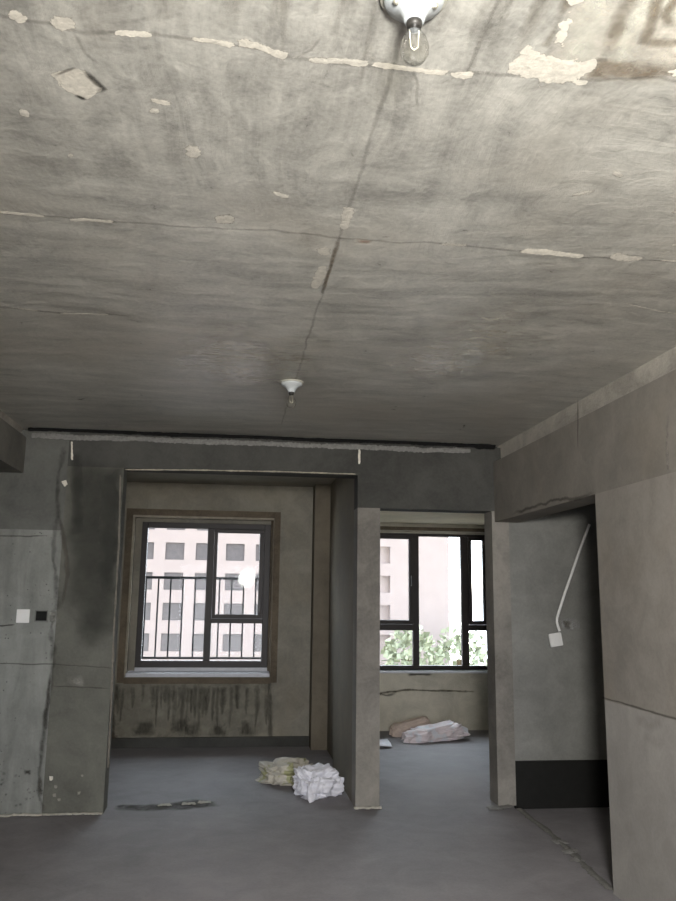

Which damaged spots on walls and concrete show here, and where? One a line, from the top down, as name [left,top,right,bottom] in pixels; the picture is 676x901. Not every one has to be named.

crack [8,10,28,23]
crack [50,15,76,32]
crack [115,29,152,37]
peeling [554,0,584,47]
peeling [643,0,676,43]
crack [192,37,474,79]
peeling [507,45,676,87]
spalling [51,68,105,99]
crack [69,216,114,224]
crack [311,247,336,289]
crack [521,248,584,258]
crack [609,253,676,262]